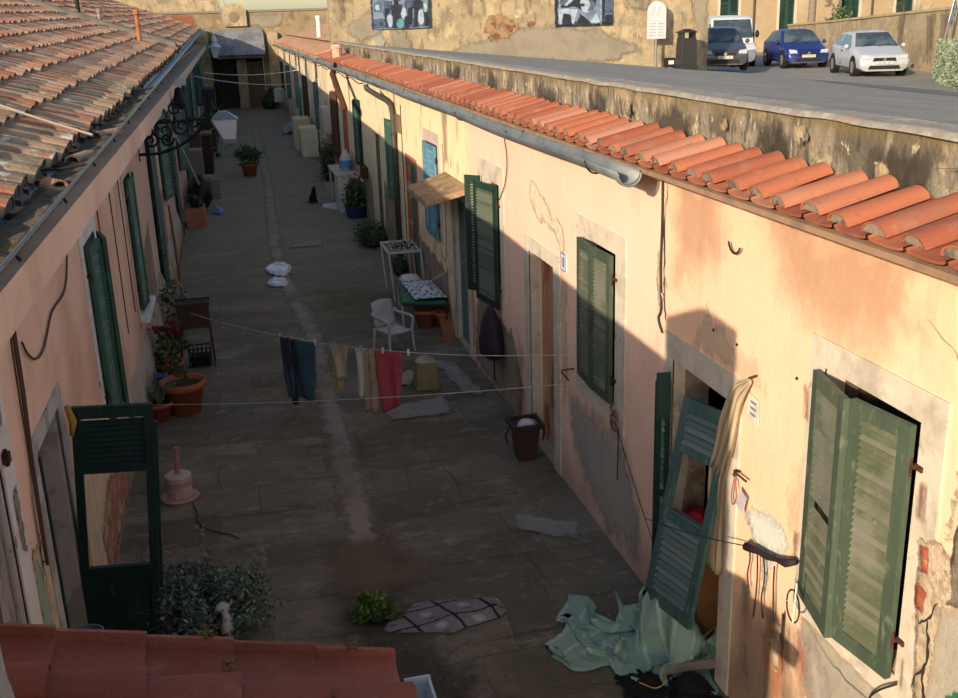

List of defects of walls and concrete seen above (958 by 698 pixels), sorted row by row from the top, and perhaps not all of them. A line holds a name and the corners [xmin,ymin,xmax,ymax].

flaking render [483,13,534,41]
peeling [528,180,564,253]
peeling [13,483,60,628]
peeling [744,507,790,595]
flaking render [912,490,958,698]
peeling [797,617,881,698]